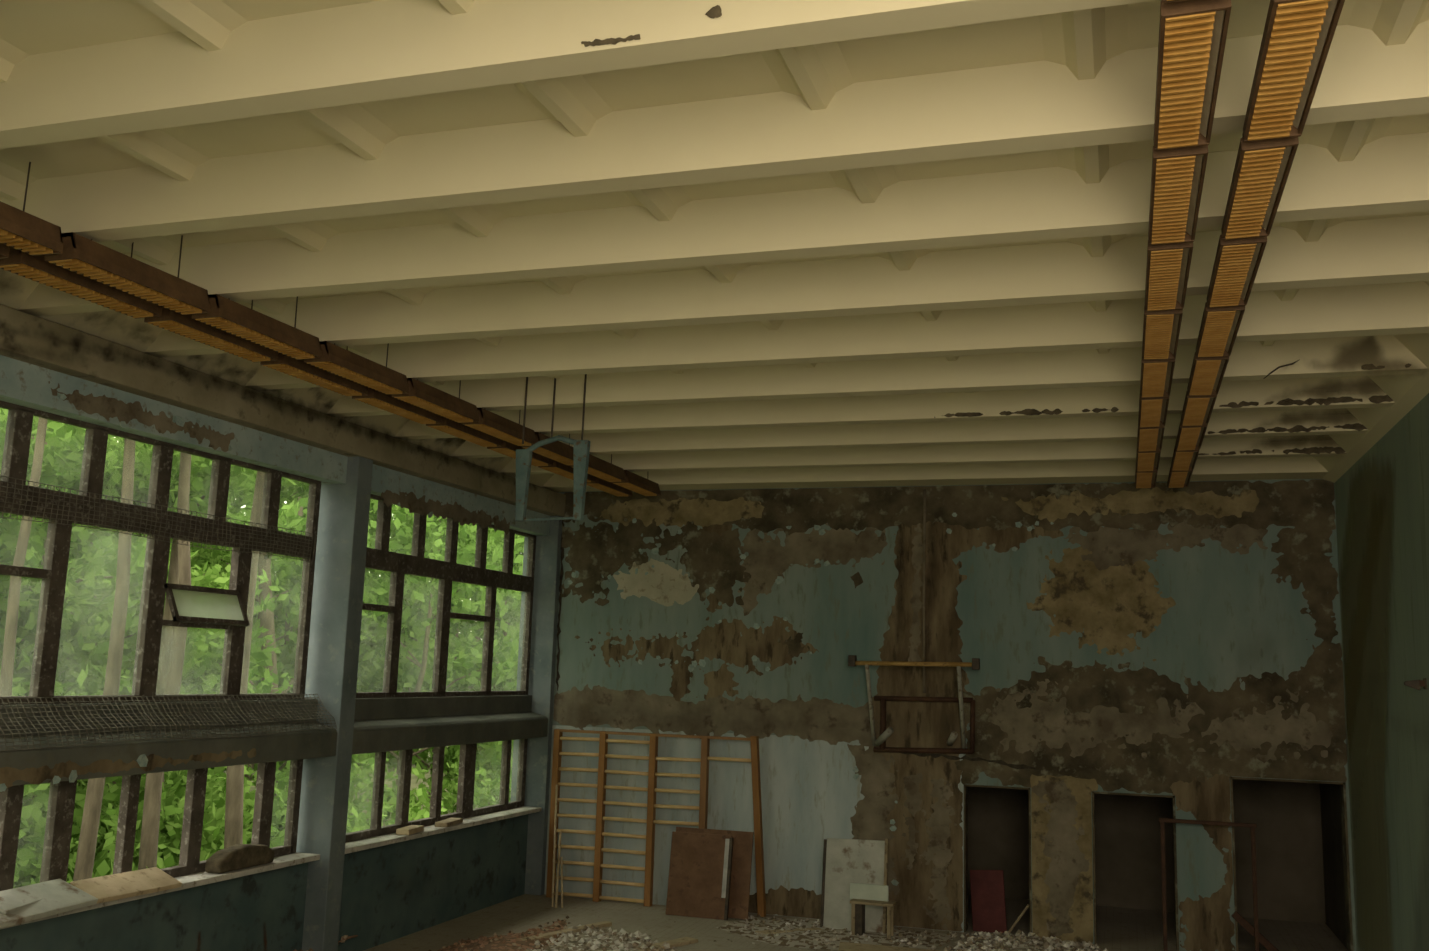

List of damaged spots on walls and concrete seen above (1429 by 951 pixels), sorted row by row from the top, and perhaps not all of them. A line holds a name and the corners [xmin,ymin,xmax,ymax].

water stain [1198,338,1411,456]
spalling [553,487,1347,951]